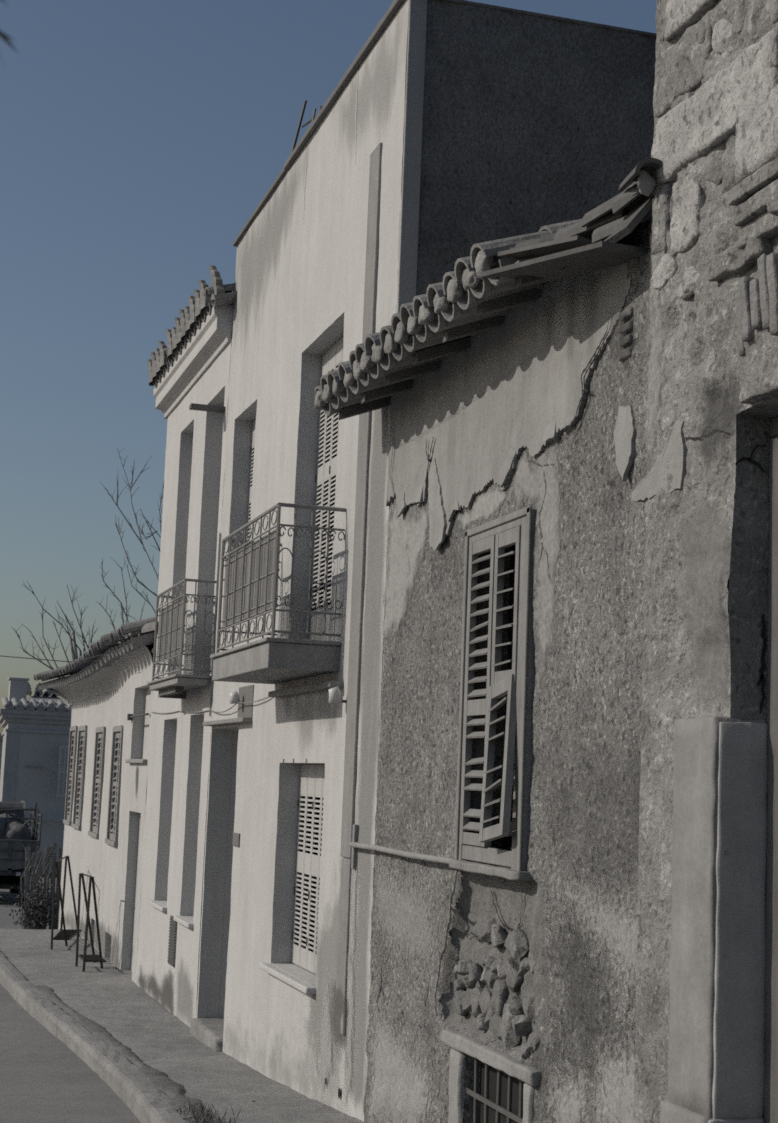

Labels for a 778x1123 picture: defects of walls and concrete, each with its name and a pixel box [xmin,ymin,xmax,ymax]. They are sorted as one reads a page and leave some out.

spalling [618,307,634,362]
peeling [614,405,687,502]
peeling [382,420,560,688]
crack [757,614,767,714]
leakage [139,975,172,1014]
spalling [435,869,549,1059]